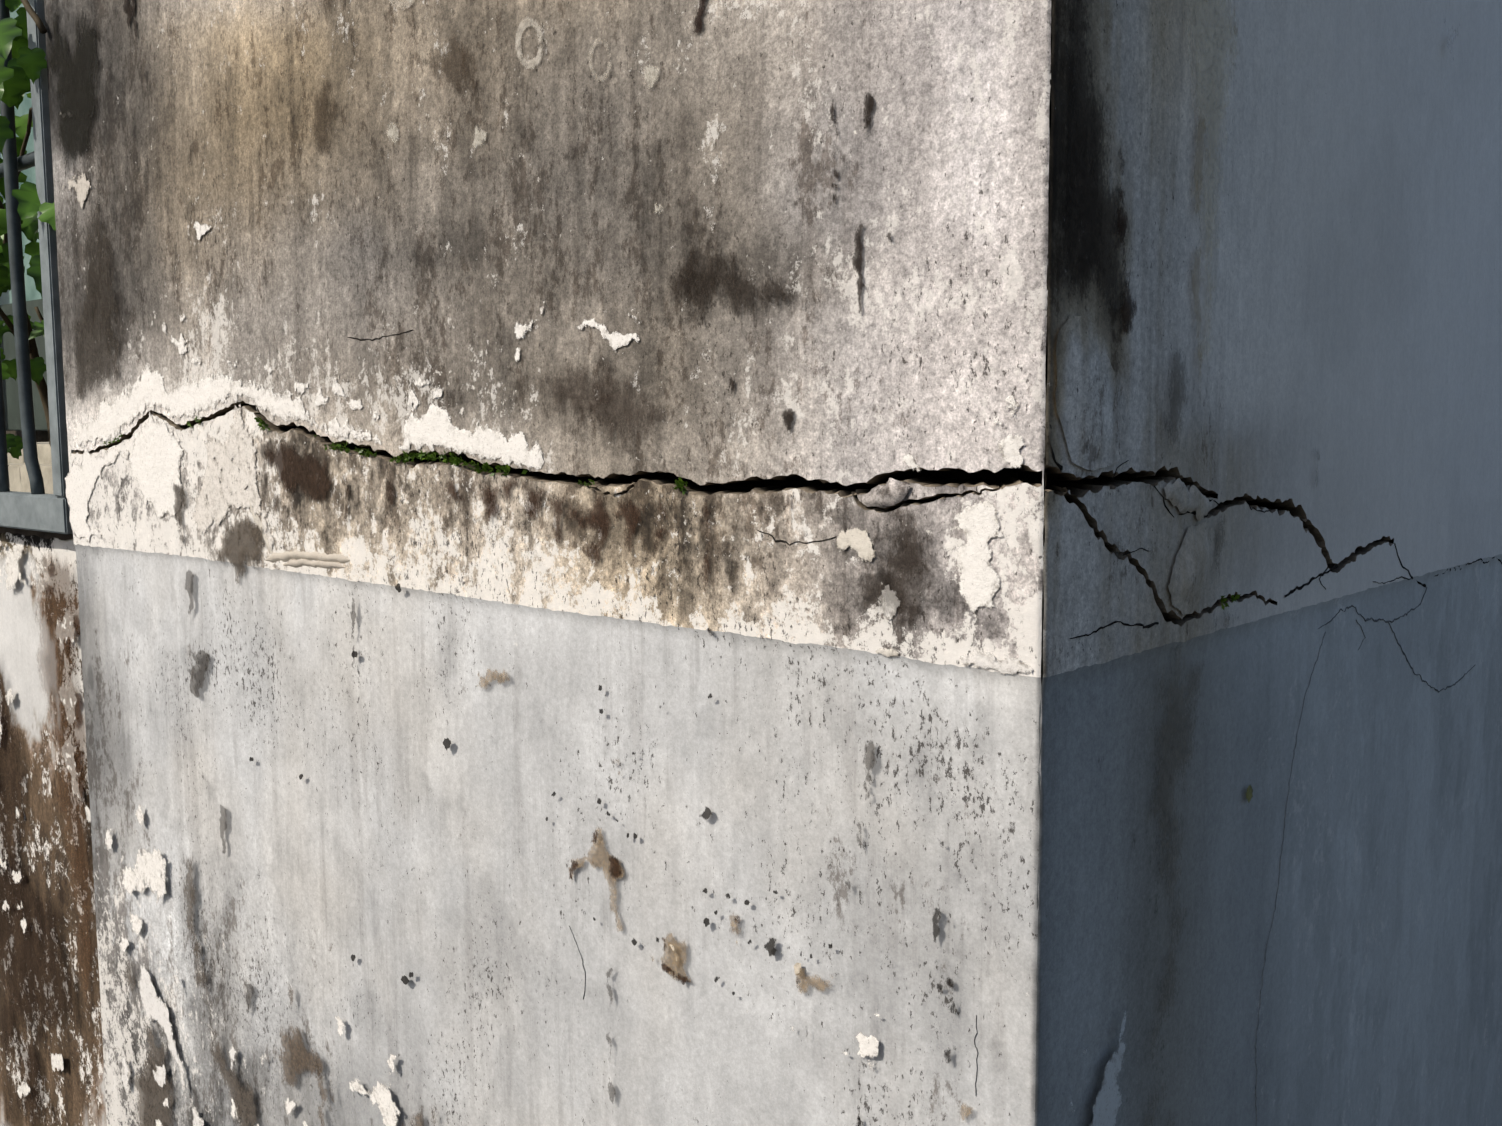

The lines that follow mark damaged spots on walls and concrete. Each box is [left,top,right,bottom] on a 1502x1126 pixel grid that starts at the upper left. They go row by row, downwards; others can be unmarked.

leakage [852,224,865,313]
peeling [0,315,381,584]
leakage [263,440,349,520]
peeling [399,376,544,470]
leakage [444,478,669,566]
peeling [860,454,920,507]
peeling [953,500,1004,613]
leakage [59,684,91,822]
crack [72,401,1502,1126]
spalling [119,846,207,1126]
leakage [51,1053,64,1072]
spalling [261,1026,436,1126]